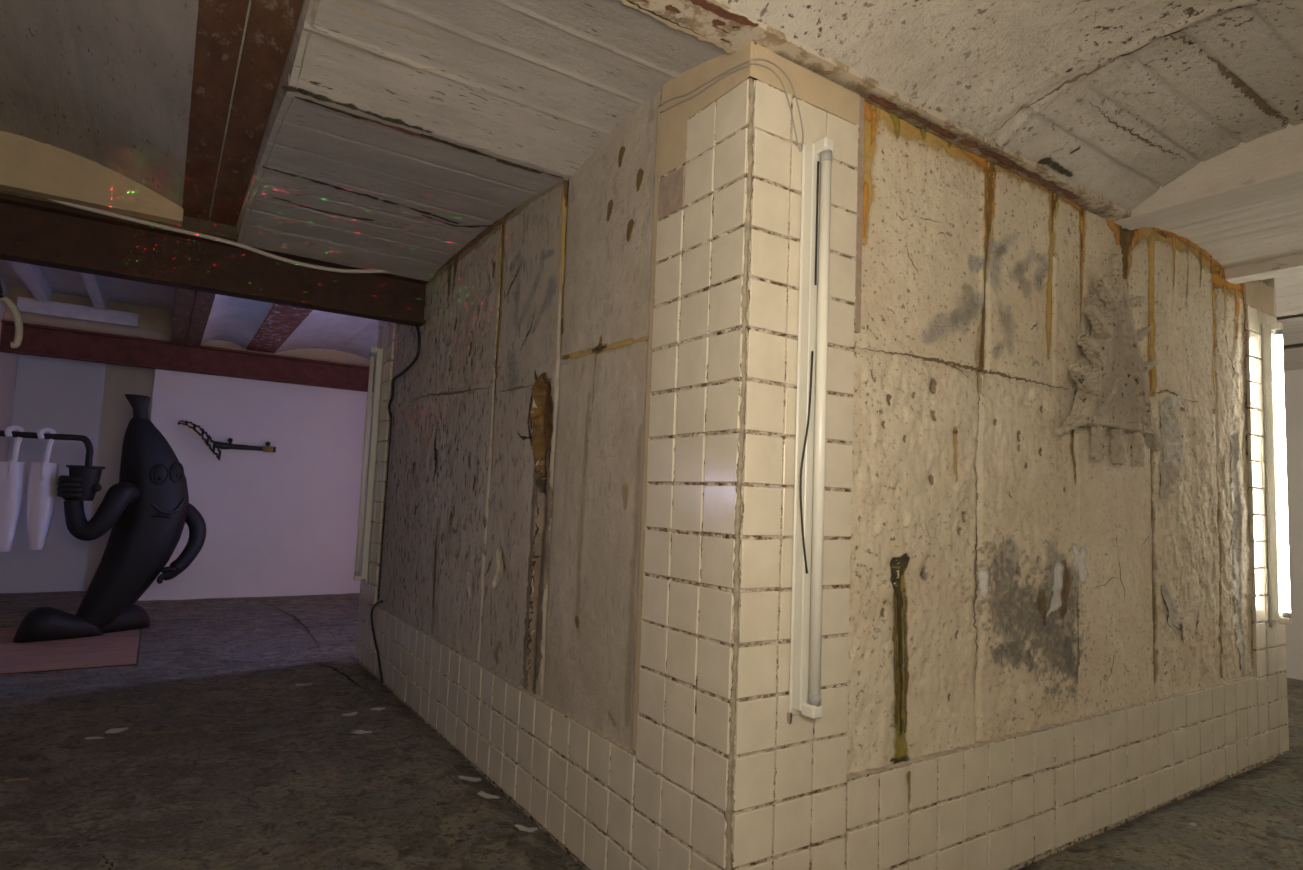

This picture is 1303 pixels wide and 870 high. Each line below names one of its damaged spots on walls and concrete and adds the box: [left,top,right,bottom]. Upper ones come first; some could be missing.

rust [862,101,1086,359]
rust [1133,227,1247,414]
crack [414,313,553,694]
damp [977,570,988,599]
spalling [972,539,1086,697]
damp [1047,545,1088,616]